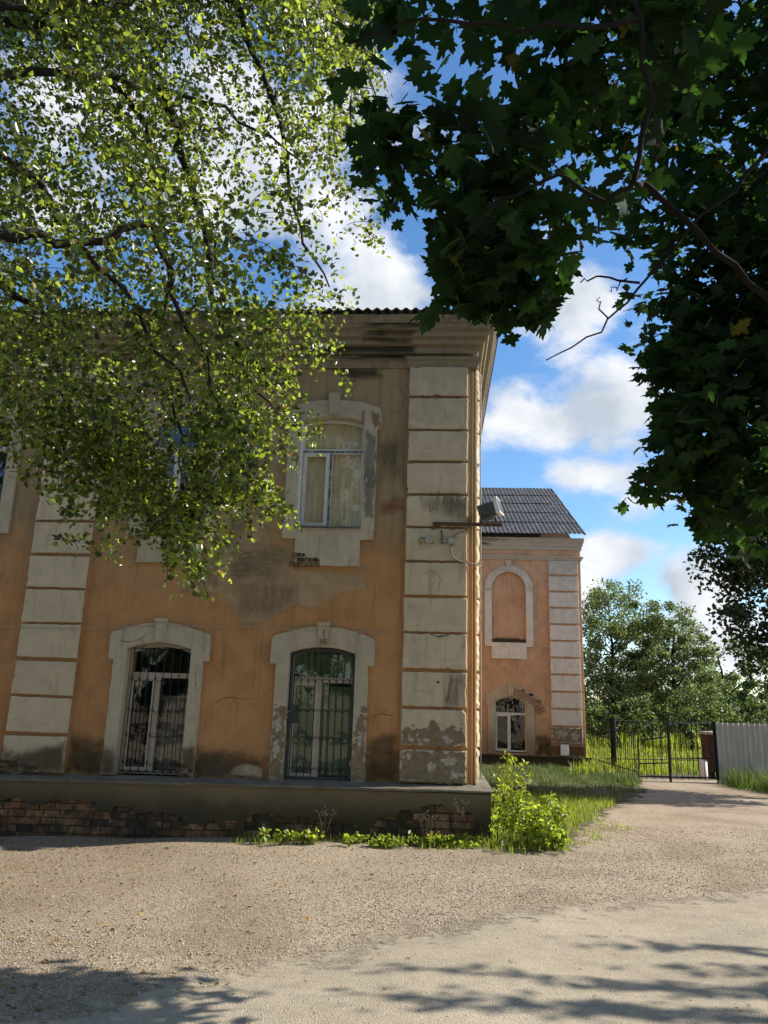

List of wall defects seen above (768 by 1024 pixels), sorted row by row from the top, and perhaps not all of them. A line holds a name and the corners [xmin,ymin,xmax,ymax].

water stain [305,322,417,377]
peeling [183,507,366,623]
peeling [231,704,289,780]
peeling [348,706,368,781]
peeling [398,719,466,786]